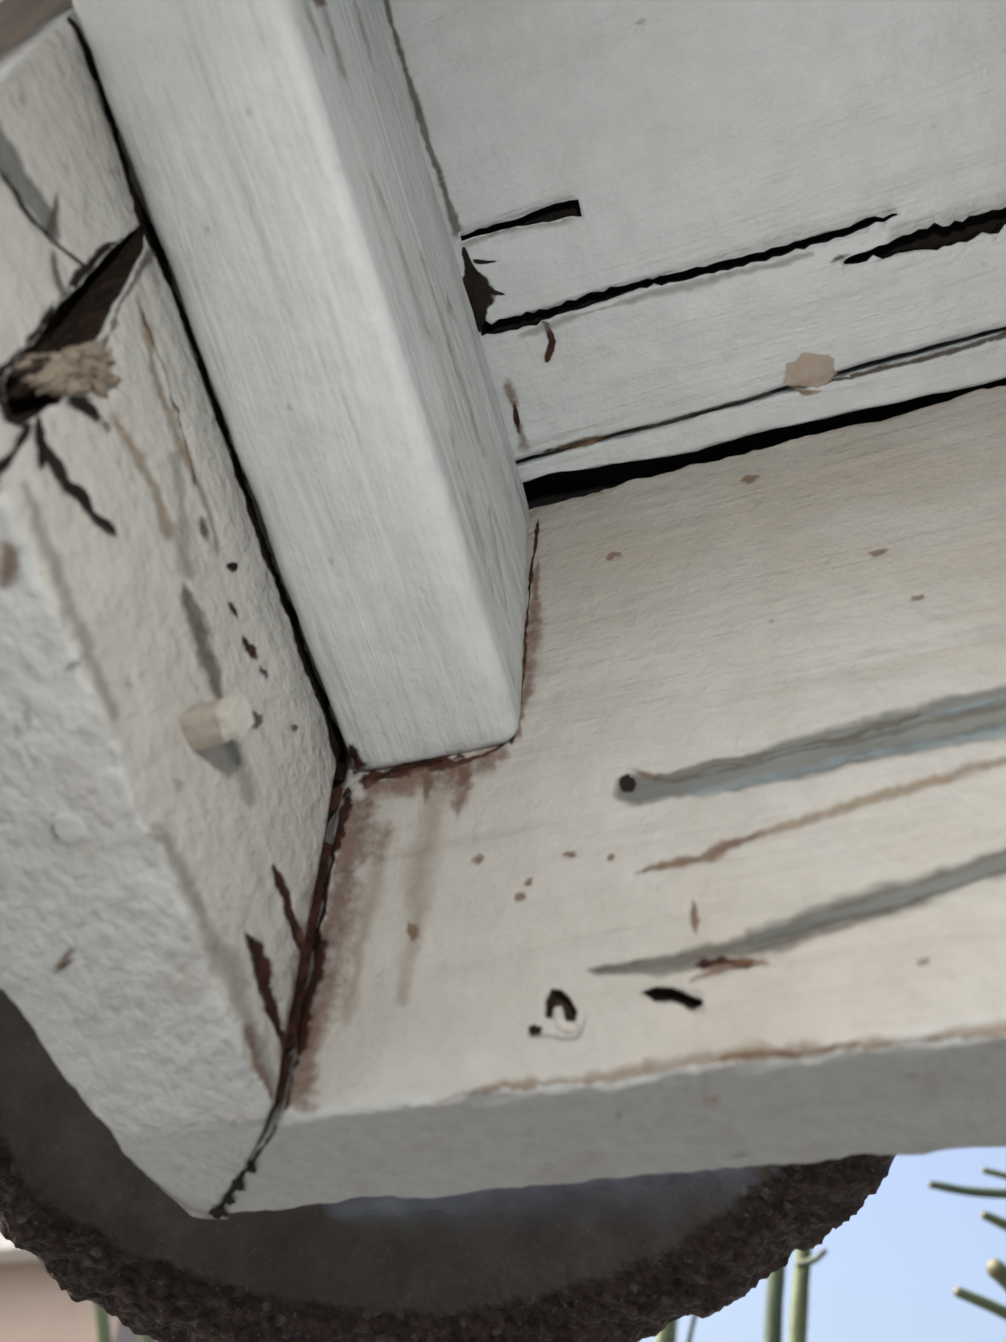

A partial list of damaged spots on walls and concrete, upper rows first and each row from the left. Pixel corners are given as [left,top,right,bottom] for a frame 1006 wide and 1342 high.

crack [461,200,1006,336]
peeling [784,353,837,395]
crack [827,331,1006,383]
crack [646,393,770,428]
crack [543,436,611,453]
leakage [616,687,1006,804]
leakage [408,922,418,940]
leakage [591,850,1006,974]
spalling [528,990,579,1036]